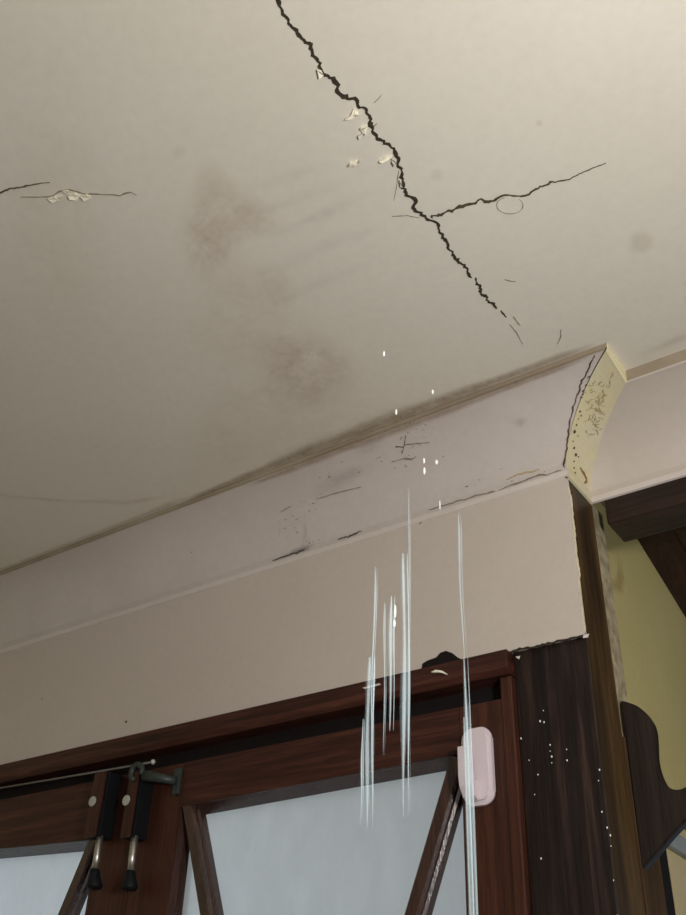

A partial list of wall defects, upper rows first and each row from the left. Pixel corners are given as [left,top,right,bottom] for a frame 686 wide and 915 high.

crack [0,182,137,203]
crack [276,0,606,344]